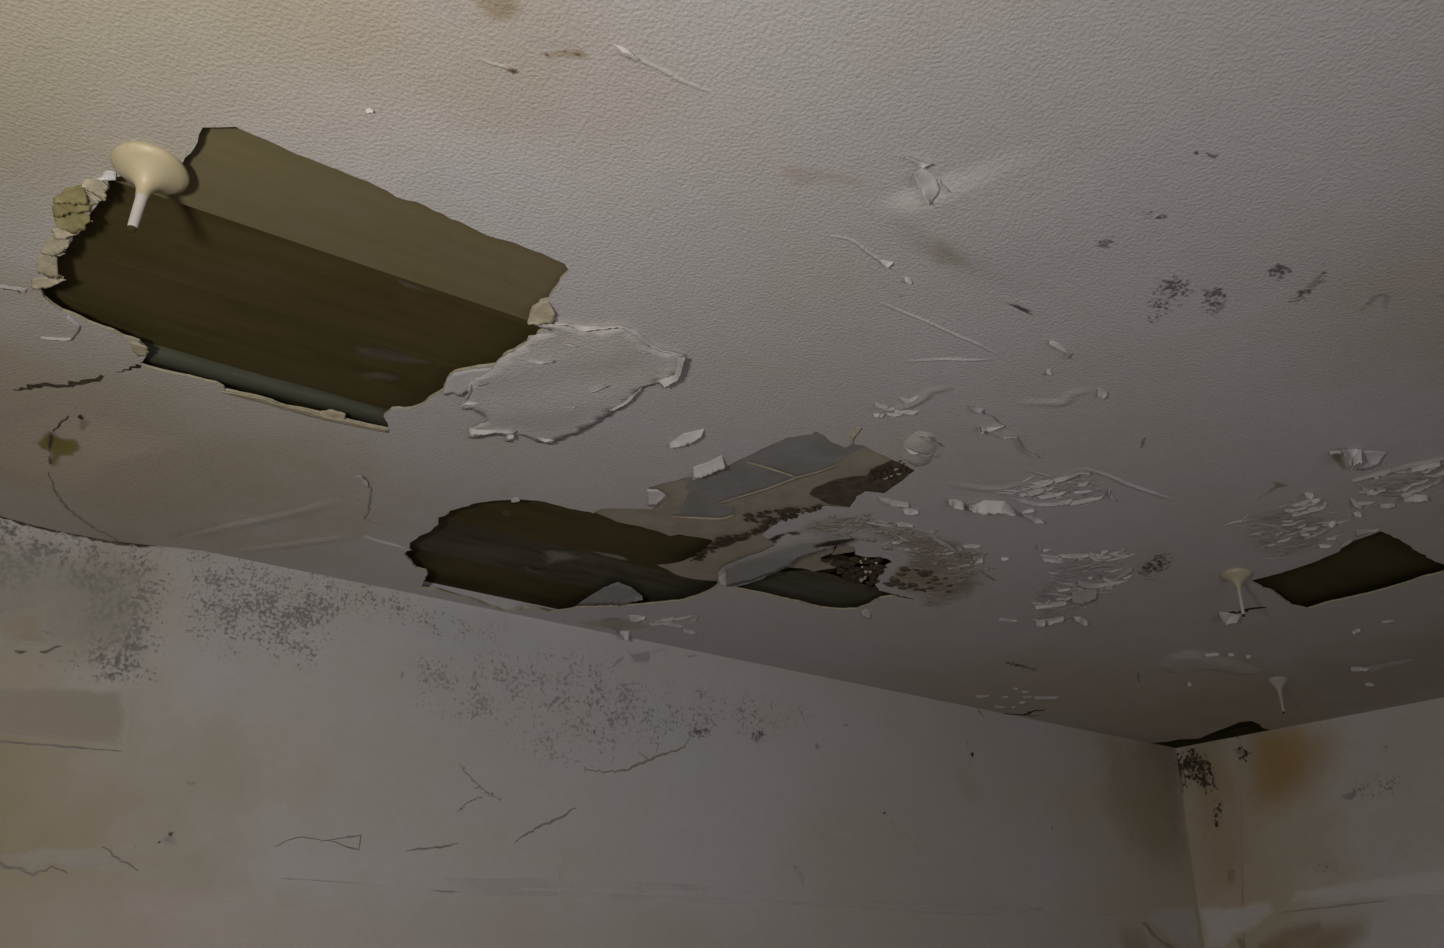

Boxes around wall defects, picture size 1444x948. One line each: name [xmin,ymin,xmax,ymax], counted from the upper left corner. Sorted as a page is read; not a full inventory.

peeling [461,321,685,445]
peeling [873,395,920,418]
spalling [595,427,1009,606]
leakage [0,520,169,680]
leakage [186,552,468,665]
leakage [421,653,803,758]
leakage [1113,731,1332,883]
leakage [1237,924,1361,948]